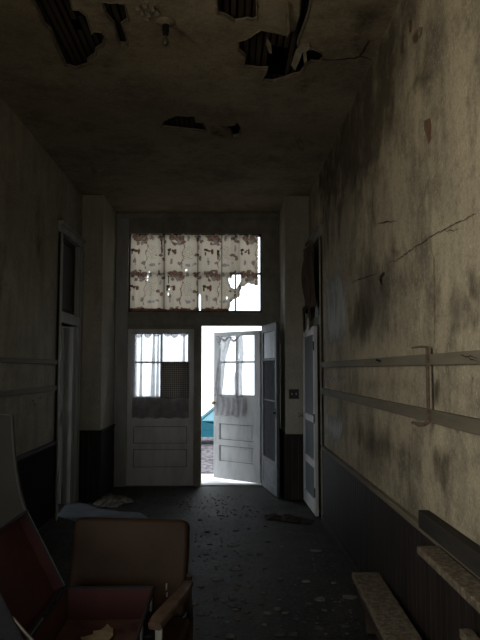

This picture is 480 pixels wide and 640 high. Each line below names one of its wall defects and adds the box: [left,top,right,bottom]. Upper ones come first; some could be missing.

flaking render [101,2,130,47]
flaking render [237,0,325,83]
crack [391,214,474,268]